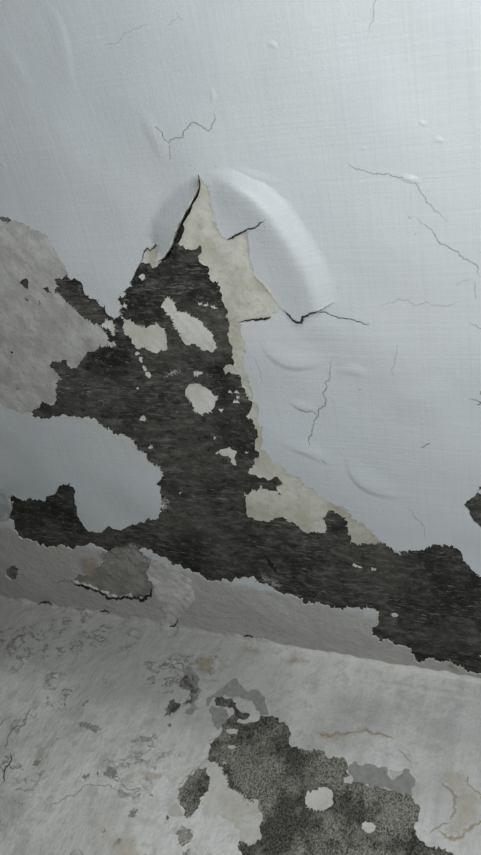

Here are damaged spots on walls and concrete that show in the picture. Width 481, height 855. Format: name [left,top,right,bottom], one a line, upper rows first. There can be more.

spalling [0,166,481,673]
crack [0,710,38,783]
peeling [175,825,193,855]
peeling [202,762,262,844]